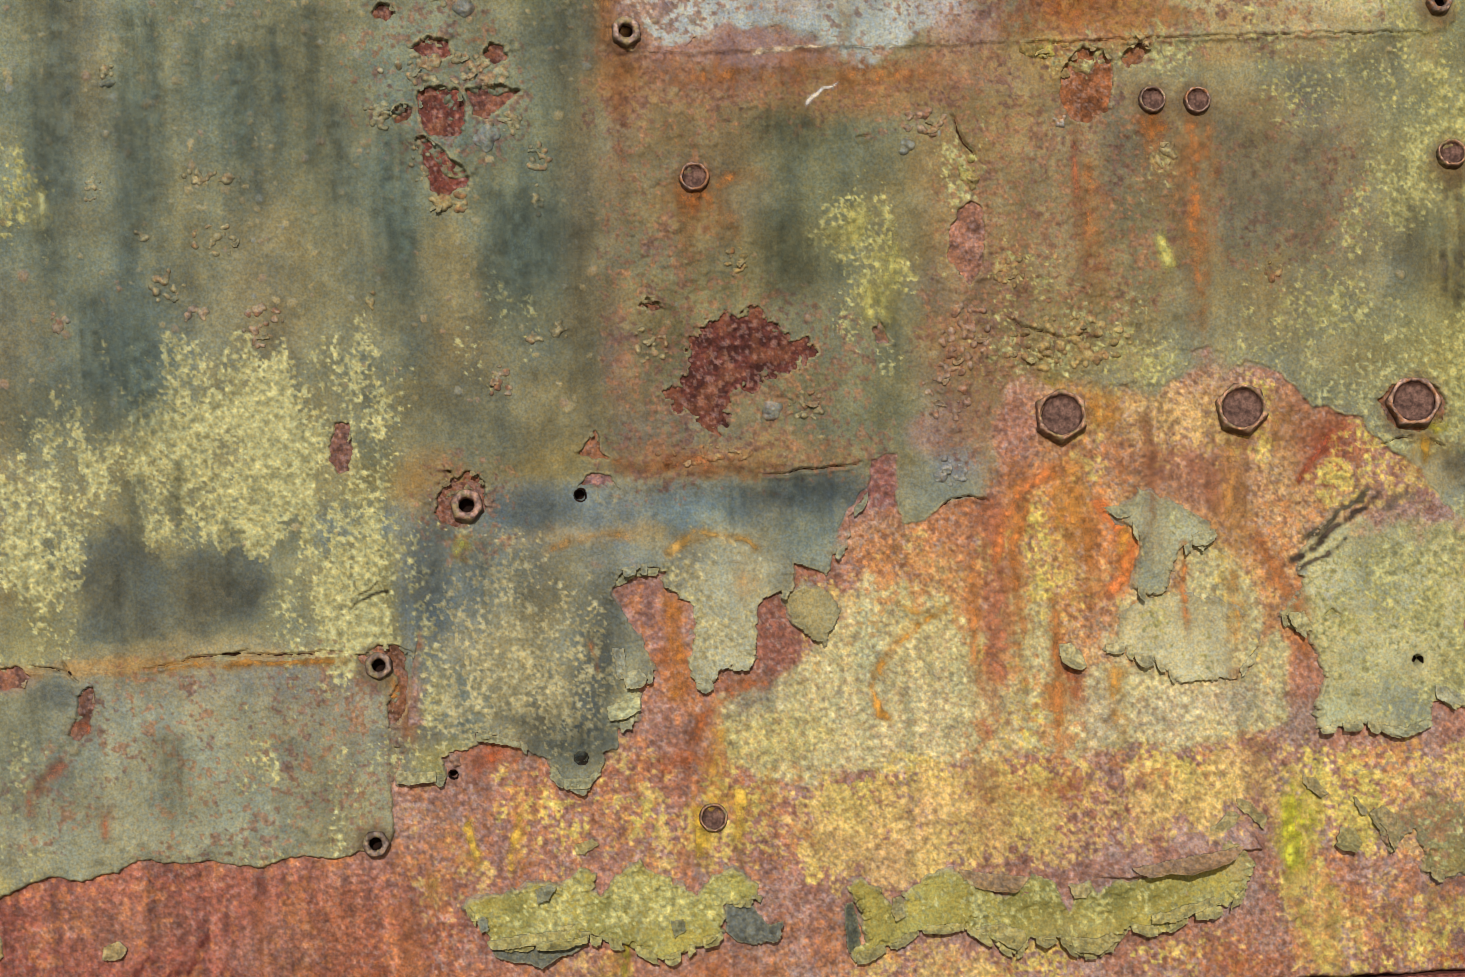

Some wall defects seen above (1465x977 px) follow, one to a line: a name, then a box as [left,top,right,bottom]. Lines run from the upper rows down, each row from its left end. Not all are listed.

corrosion [1059,44,1152,123]
peeling [390,486,870,796]
corrosion [665,531,758,555]
corrosion [680,679,765,766]
corrosion [873,606,937,720]
corrosion [968,469,1136,680]
corrosion [1052,598,1078,738]
peeling [1101,487,1261,685]
peeling [1278,463,1465,738]
peeling [461,838,784,969]
peeling [844,798,1268,964]
peeling [1302,761,1465,883]